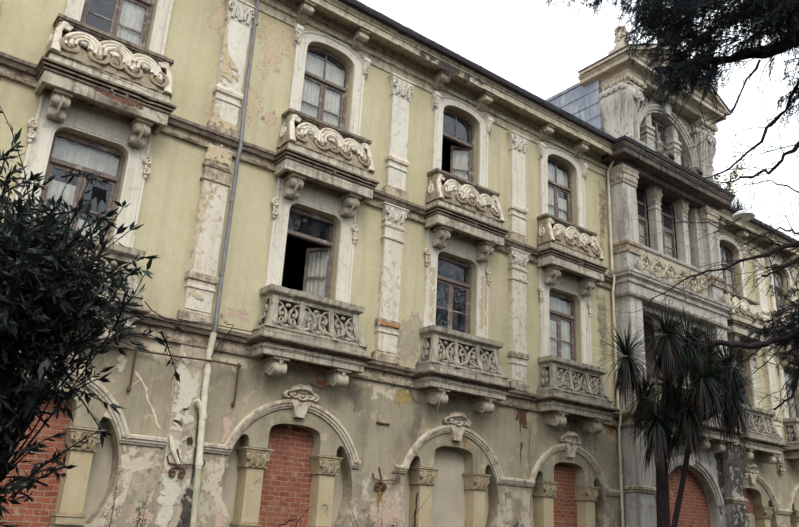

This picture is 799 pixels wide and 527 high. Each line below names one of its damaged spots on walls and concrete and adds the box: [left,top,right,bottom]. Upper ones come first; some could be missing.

peeling [209,14,295,132]
crack [132,371,161,430]
peeling [110,338,202,527]
peeling [201,454,230,527]